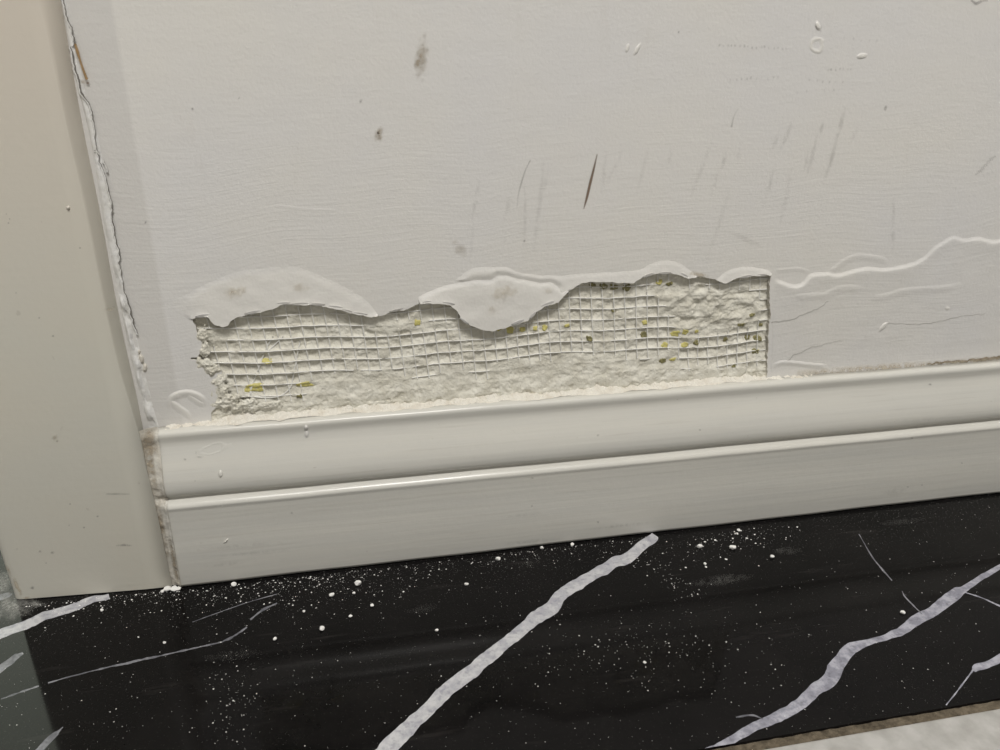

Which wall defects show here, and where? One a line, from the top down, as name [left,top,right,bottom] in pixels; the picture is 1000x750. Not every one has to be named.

crack [61,0,138,335]
flaking render [194,236,1000,421]